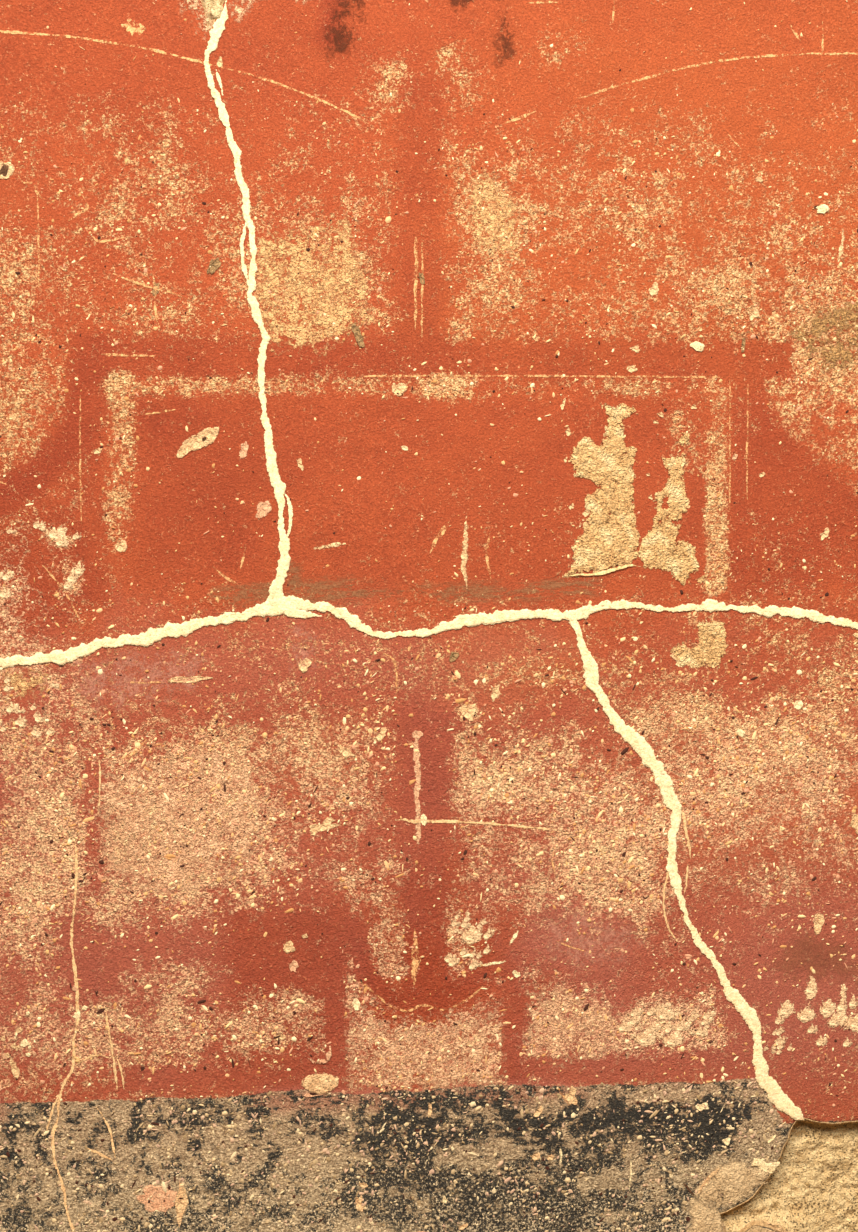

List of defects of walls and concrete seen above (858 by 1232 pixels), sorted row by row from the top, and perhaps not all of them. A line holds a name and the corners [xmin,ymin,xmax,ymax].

spalling [181,0,255,33]
leakage [326,2,363,53]
leakage [499,18,514,64]
crack [113,273,182,331]
crack [204,0,293,604]
peeling [562,403,708,585]
crack [42,565,82,624]
crack [0,595,858,1120]
crack [46,844,124,1232]
spalling [719,1118,858,1232]